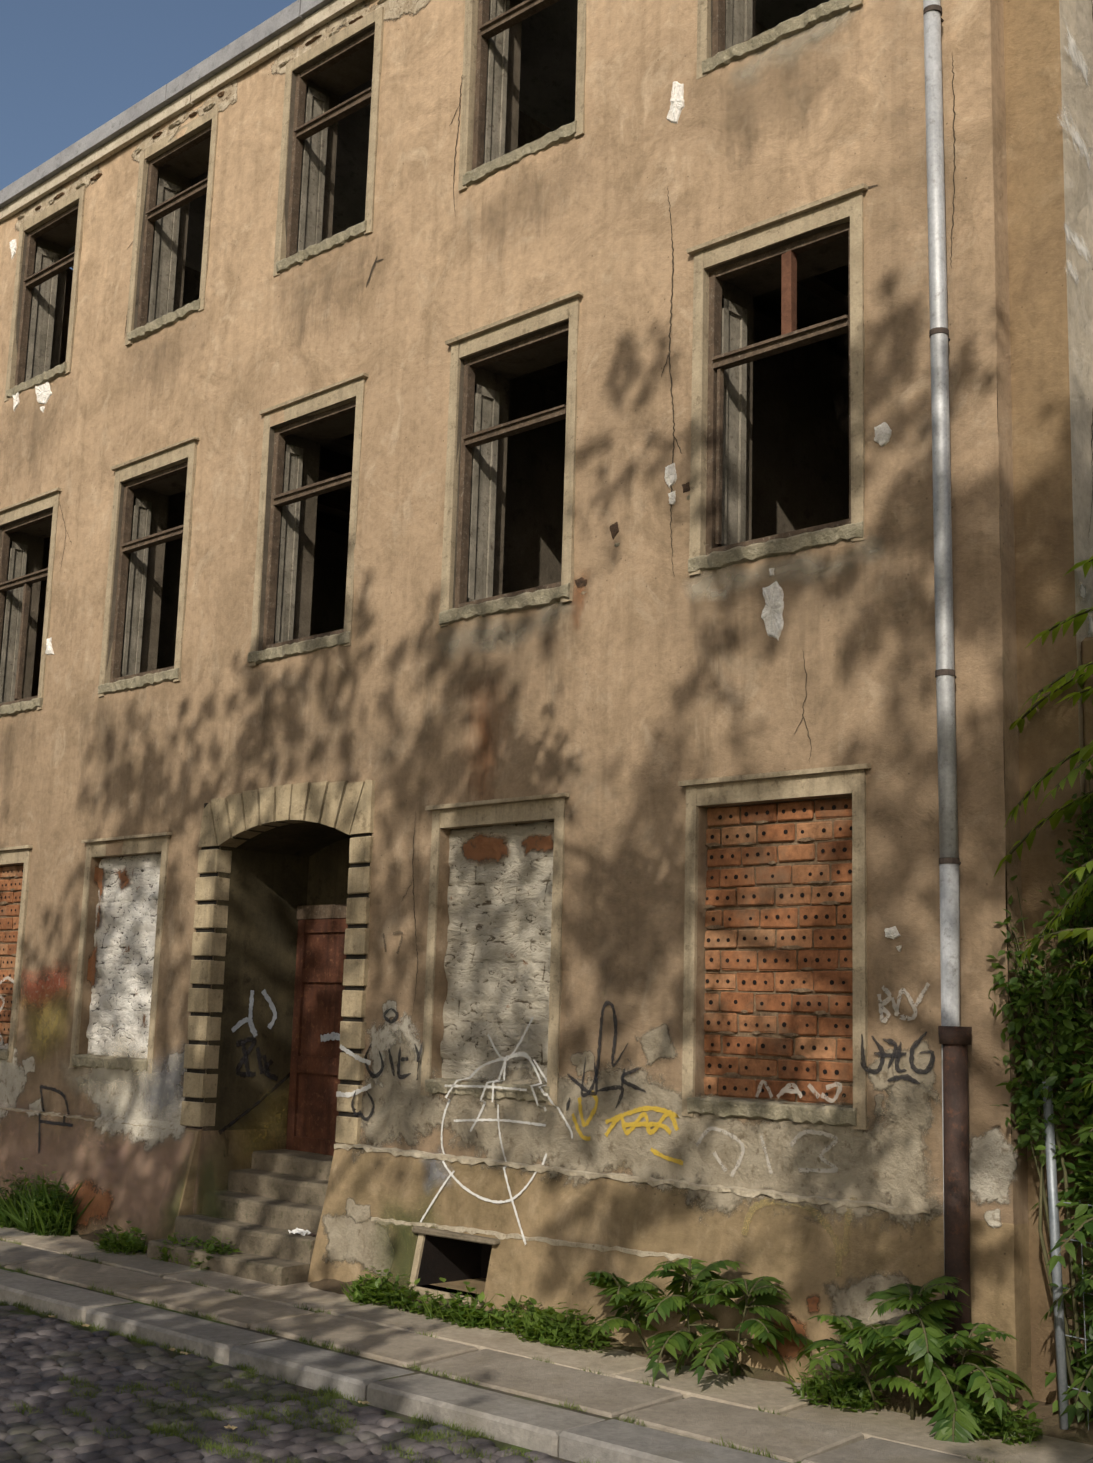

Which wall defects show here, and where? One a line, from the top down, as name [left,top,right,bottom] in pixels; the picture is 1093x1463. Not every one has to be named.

flaking render [271,0,430,75]
crack [661,188,682,574]
crack [1085,422,1093,531]
flaking render [352,1000,943,1230]
peeling [345,1198,370,1224]
flaking render [969,1128,1018,1228]